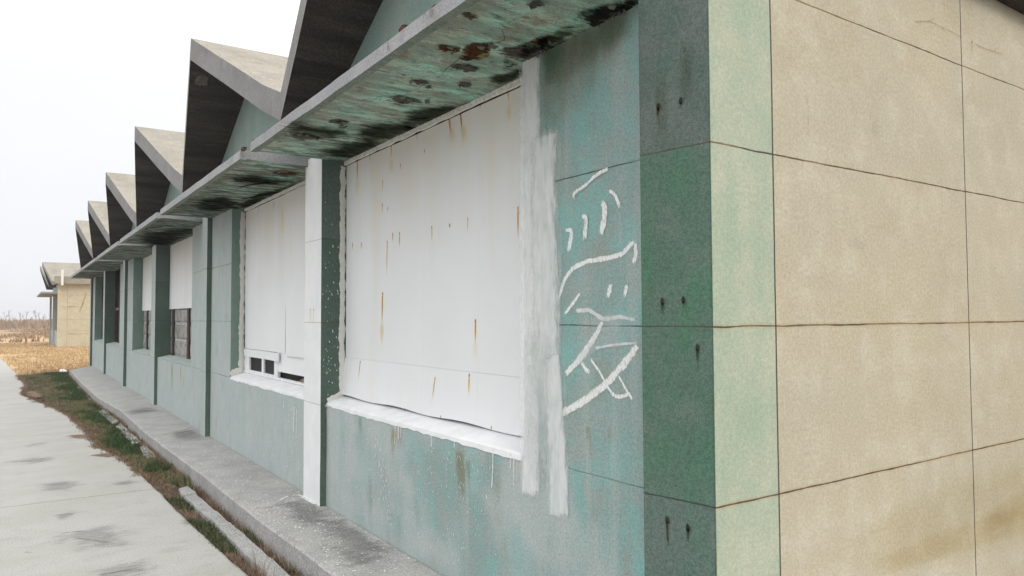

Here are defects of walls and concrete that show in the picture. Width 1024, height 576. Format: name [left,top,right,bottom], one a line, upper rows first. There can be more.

mould [518,0,638,57]
mould [488,66,522,84]
mould [285,105,456,159]
mould [191,175,296,212]